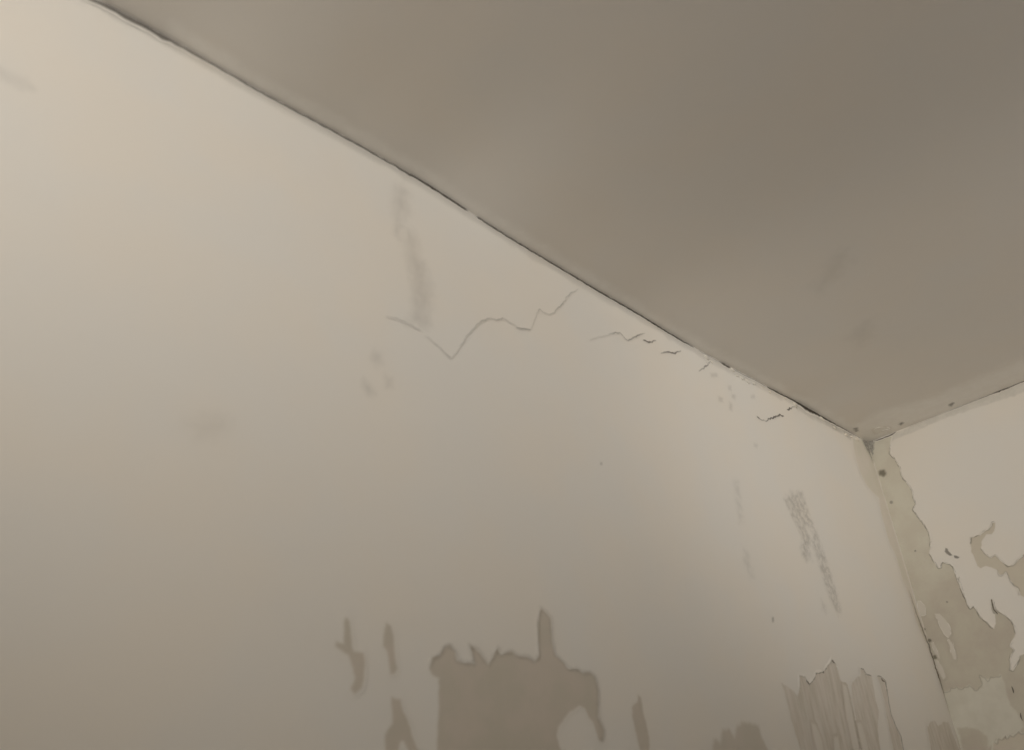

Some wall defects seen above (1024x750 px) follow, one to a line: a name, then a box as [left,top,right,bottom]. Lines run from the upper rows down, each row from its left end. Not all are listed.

crack [85,0,1024,442]
peeling [820,416,1024,750]
peeling [332,614,369,698]
peeling [380,619,400,678]
peeling [381,693,420,750]
peeling [426,605,606,750]
peeling [630,691,652,750]
peeling [779,656,904,750]